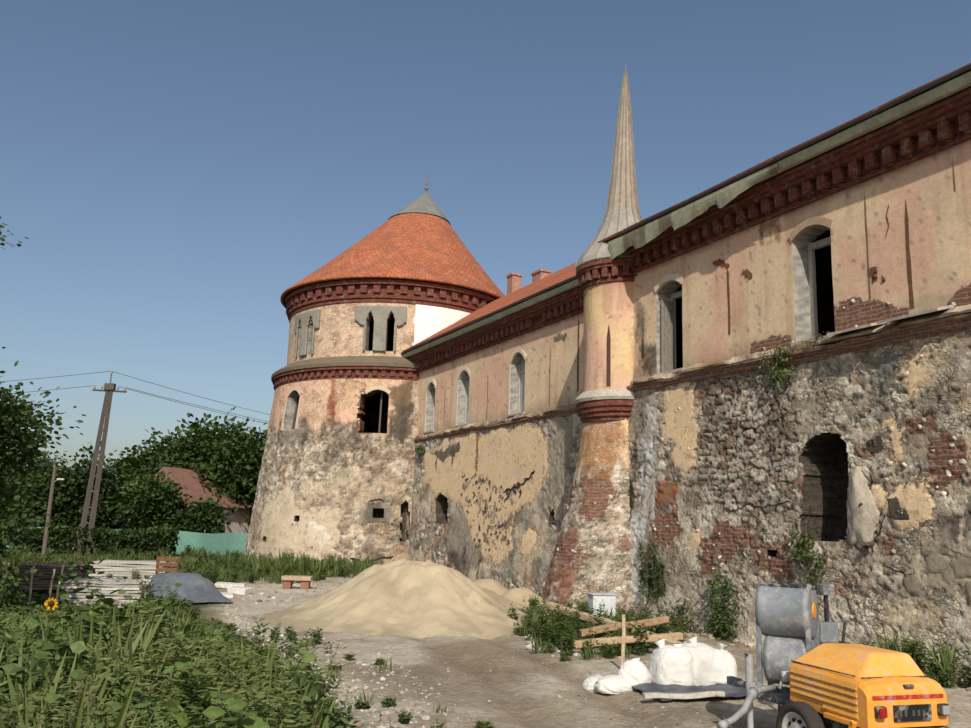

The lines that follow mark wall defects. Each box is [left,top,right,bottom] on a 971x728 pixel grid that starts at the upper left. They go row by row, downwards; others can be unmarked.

flaking render [750,334,794,354]
flaking render [834,297,909,332]
flaking render [944,283,971,310]
flaking render [255,481,342,561]
spalling [359,501,395,525]
flaking render [421,422,550,566]
flaking render [553,468,616,570]
flaking render [650,504,792,588]
flaking render [866,347,971,609]